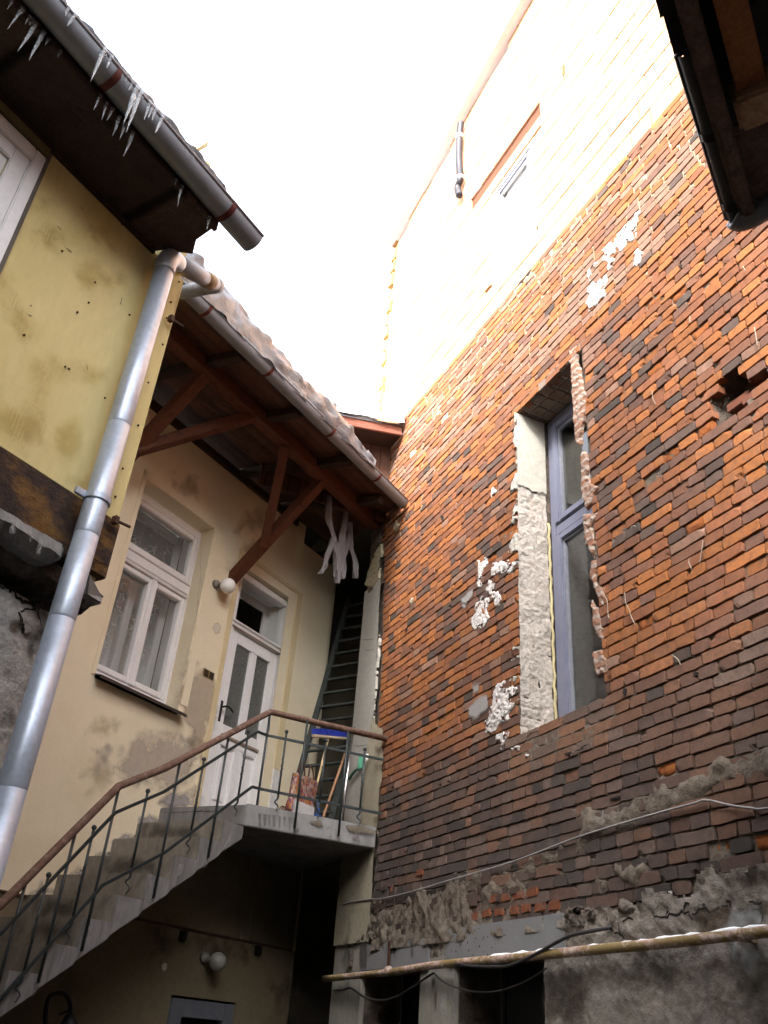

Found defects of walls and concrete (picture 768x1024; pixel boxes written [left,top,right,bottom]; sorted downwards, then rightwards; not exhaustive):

peeling [585,256,615,312]
peeling [632,249,643,267]
spalling [698,374,768,439]
spalling [471,412,520,630]
spalling [569,346,608,677]
damp [121,672,215,784]
flaking render [423,929,492,957]
crack [610,900,764,939]
flaking render [697,903,730,931]